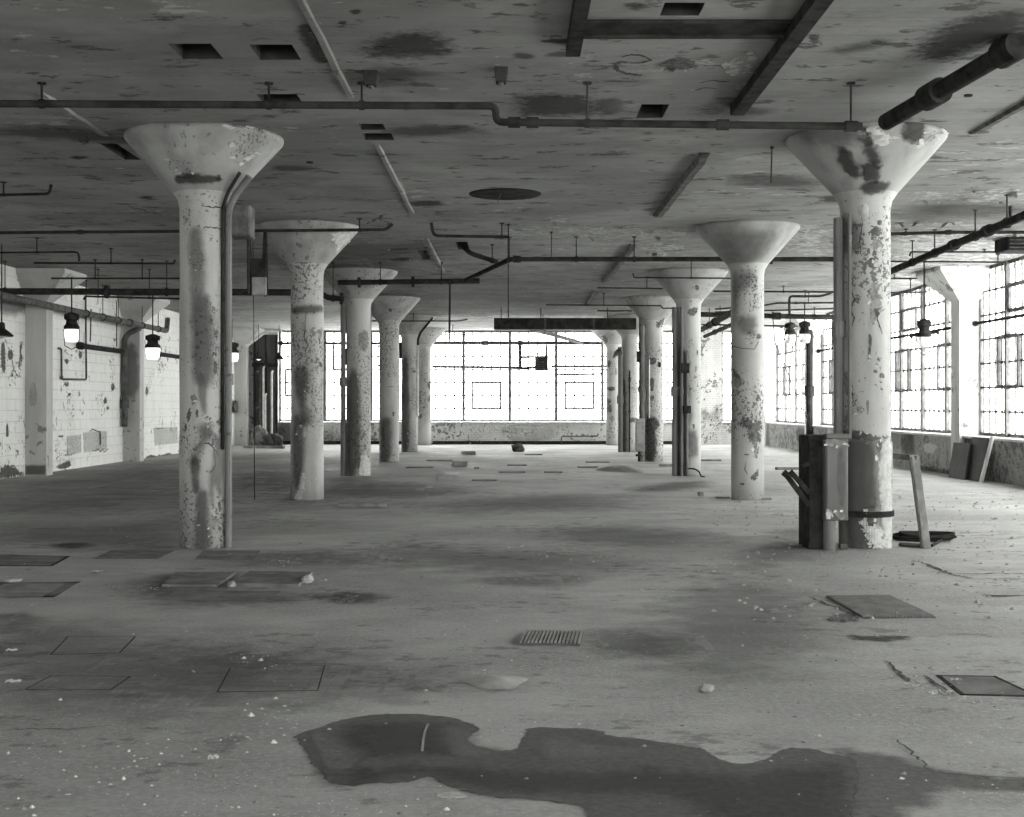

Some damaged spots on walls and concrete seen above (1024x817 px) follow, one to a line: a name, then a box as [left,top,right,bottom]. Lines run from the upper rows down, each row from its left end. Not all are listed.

leakage [364,33,445,83]
leakage [912,12,1024,60]
leakage [517,95,621,117]
leakage [802,128,889,195]
leakage [190,229,221,412]
peeling [0,338,24,386]
peeling [732,369,745,393]
spalling [56,382,76,470]
peeling [739,394,763,485]
peeling [824,369,896,461]
crack [886,661,954,694]
leakage [294,714,1024,817]